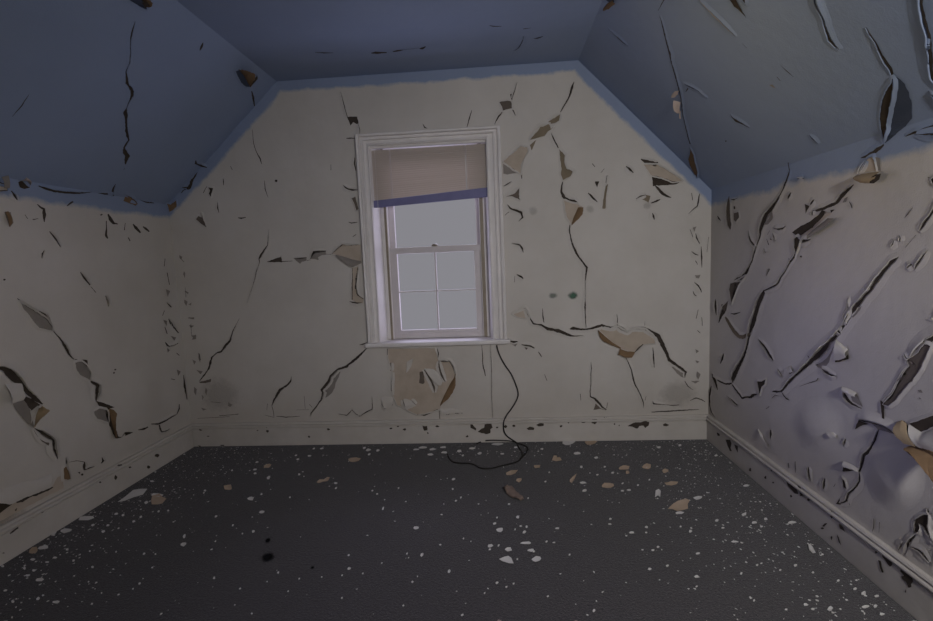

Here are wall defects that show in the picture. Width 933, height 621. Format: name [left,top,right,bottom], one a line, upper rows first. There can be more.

crack [807,0,843,52]
crack [907,0,933,89]
crack [119,21,137,170]
peeling [0,175,154,208]
peeling [100,214,150,241]
crack [198,229,331,383]
peeling [501,0,933,544]
crack [728,162,792,306]
crack [888,200,933,272]
peeling [0,359,107,483]
crack [266,340,368,418]
peeling [386,346,458,434]